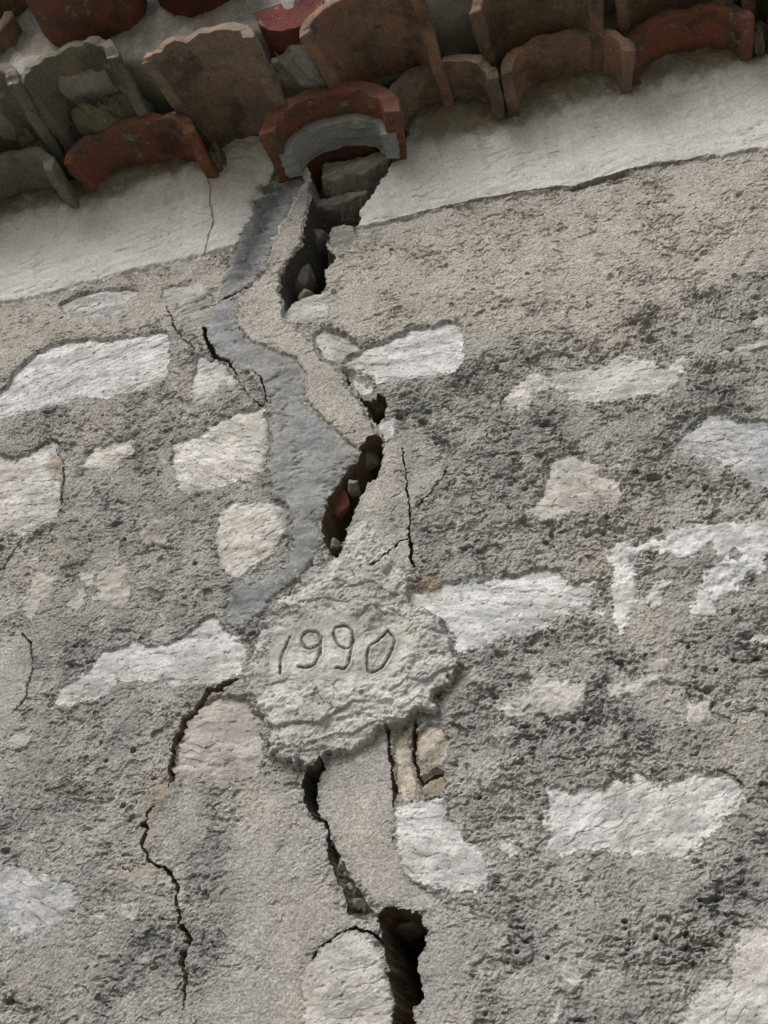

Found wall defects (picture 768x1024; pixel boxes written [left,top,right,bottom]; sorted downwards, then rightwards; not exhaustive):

crack [165,163,392,407]
crack [321,370,447,568]
crack [111,677,242,1011]
crack [302,755,385,960]
crack [383,716,445,808]